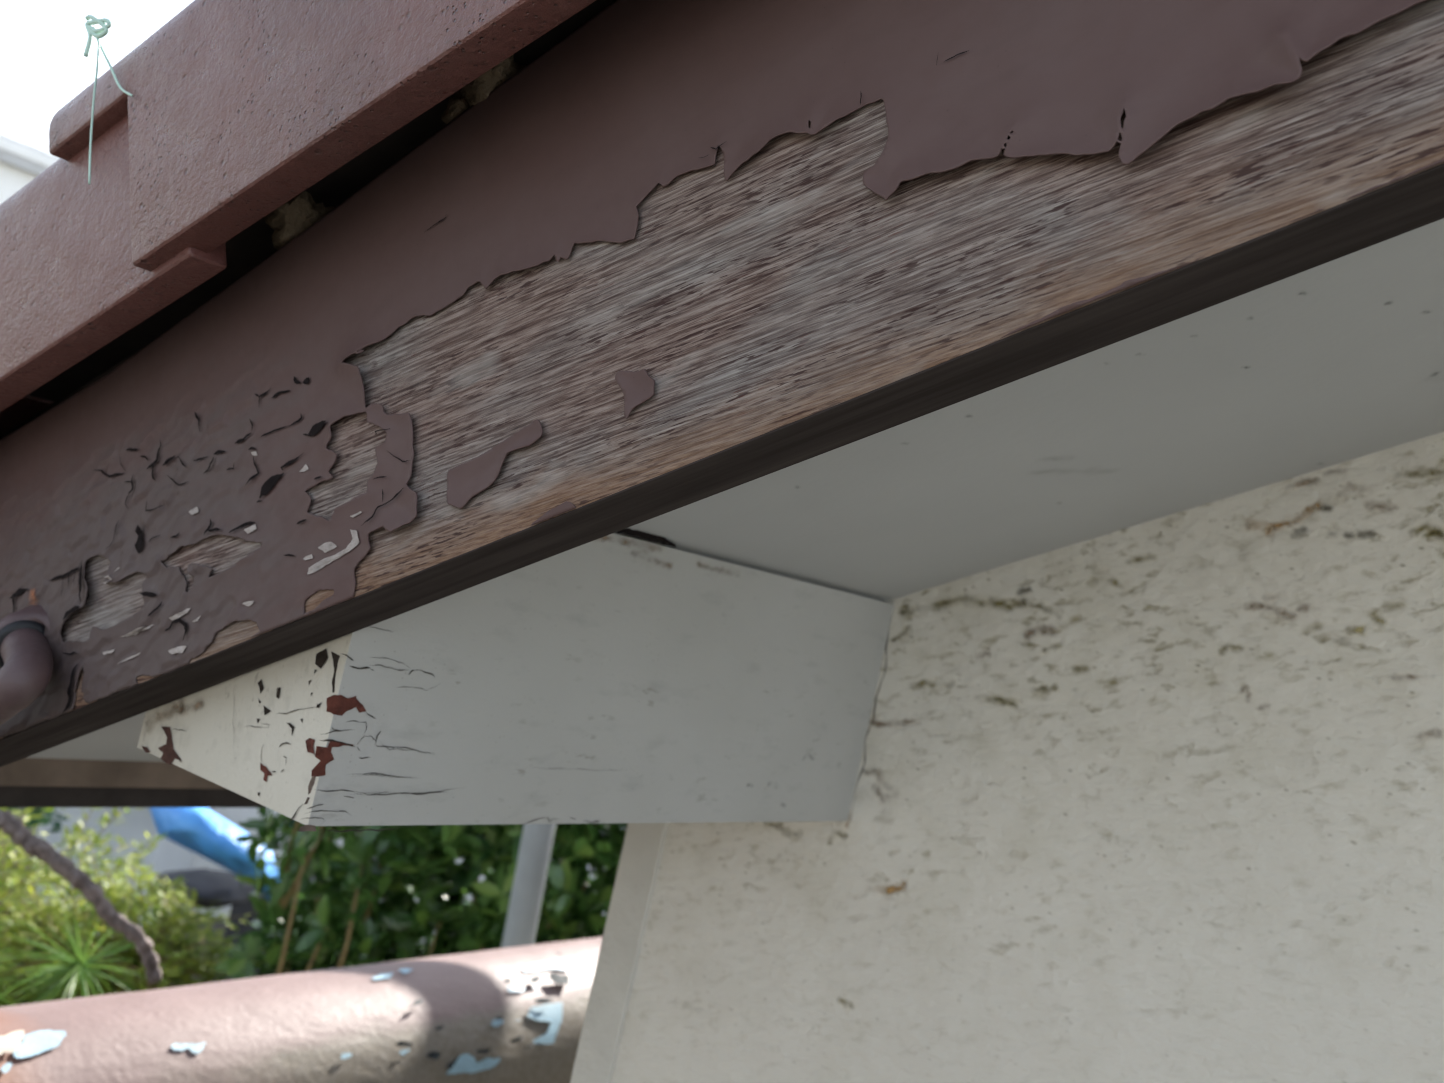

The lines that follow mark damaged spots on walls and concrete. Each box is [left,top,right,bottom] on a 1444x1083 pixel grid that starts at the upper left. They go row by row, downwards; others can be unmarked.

peeling [298,0,1444,620]
water stain [1267,503,1331,533]
water stain [1415,525,1443,537]
peeling [61,555,152,665]
peeling [168,601,271,666]
peeling [257,679,281,723]
peeling [309,648,366,716]
crack [343,626,439,690]
water stain [981,588,1041,610]
peeling [142,726,181,764]
peeling [287,719,355,805]
crack [233,688,456,832]